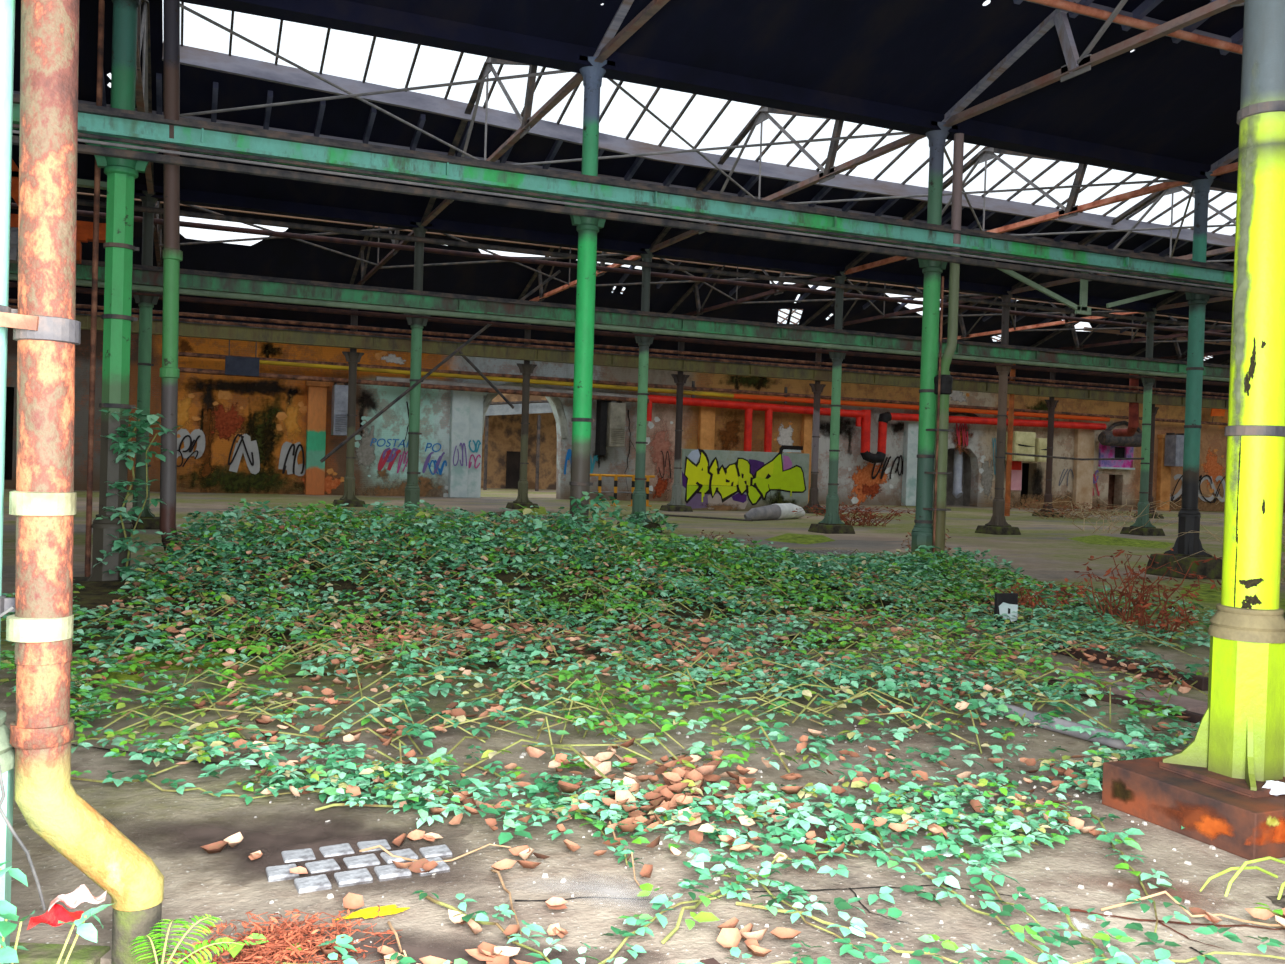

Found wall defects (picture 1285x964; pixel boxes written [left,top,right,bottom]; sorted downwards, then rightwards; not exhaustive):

damp [180,379,304,493]
flaking render [1201,436,1264,609]
rust [1112,782,1132,801]
rust [1167,805,1230,837]
rust [1259,816,1285,844]